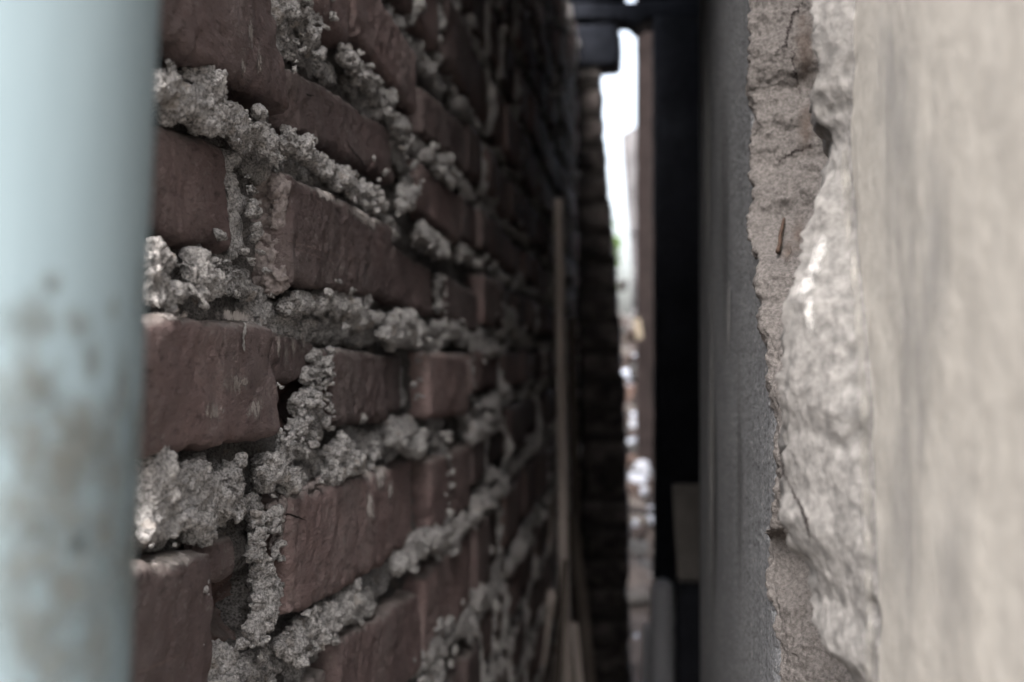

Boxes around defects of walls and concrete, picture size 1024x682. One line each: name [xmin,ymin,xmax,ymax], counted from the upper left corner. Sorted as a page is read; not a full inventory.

crack [775,1,803,100]
crack [779,144,811,162]
spalling [745,0,882,682]